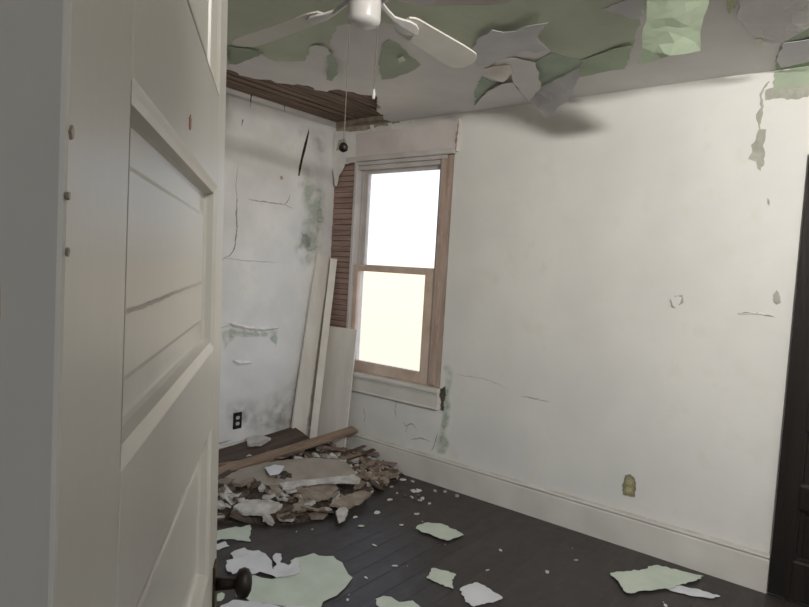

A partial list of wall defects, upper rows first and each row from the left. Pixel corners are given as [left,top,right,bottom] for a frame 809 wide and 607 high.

peeling [227,0,349,81]
peeling [378,0,709,118]
flaking render [765,28,809,100]
crack [225,170,291,263]
flaking render [622,474,636,497]